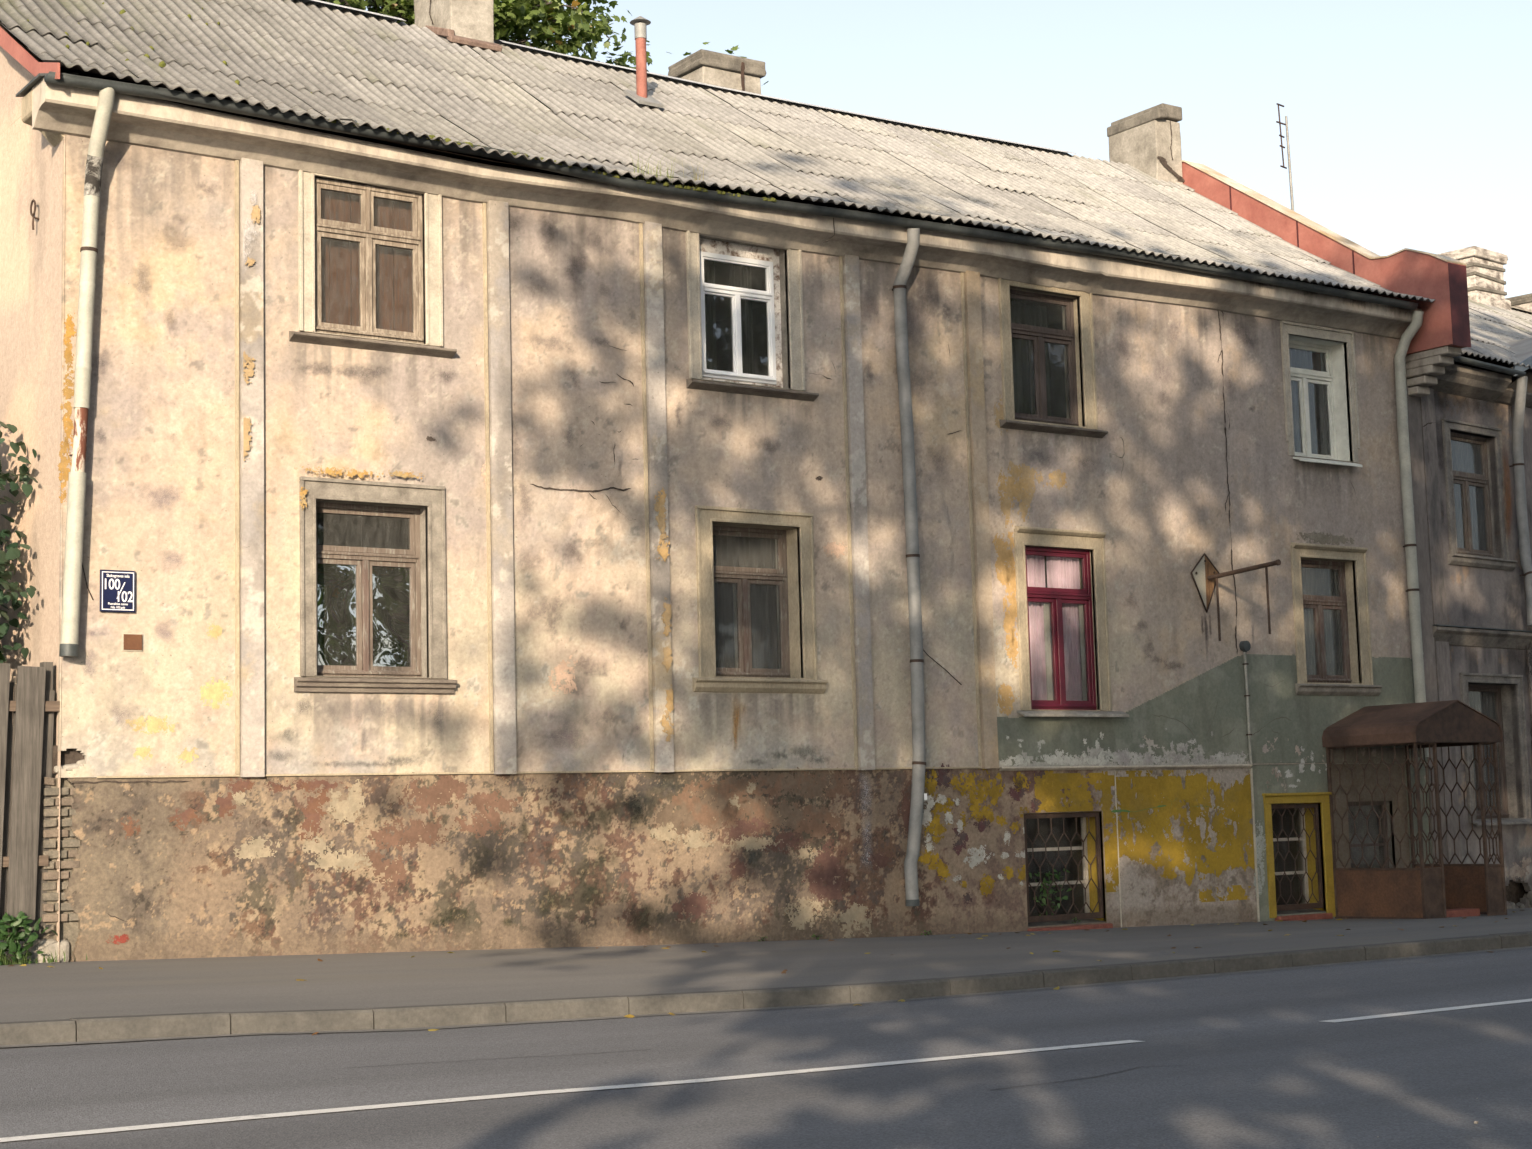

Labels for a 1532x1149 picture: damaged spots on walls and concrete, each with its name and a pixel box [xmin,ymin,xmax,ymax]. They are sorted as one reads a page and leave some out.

crack [531,346,638,521]
peeling [654,484,670,561]
peeling [992,460,1067,669]
spalling [41,745,199,963]
peeling [125,715,178,761]
peeling [200,677,233,709]
peeling [168,772,523,895]
peeling [660,598,674,742]
peeling [997,683,1019,716]
peeling [900,728,1249,907]
peeling [1277,746,1327,788]
spalling [1504,857,1532,909]